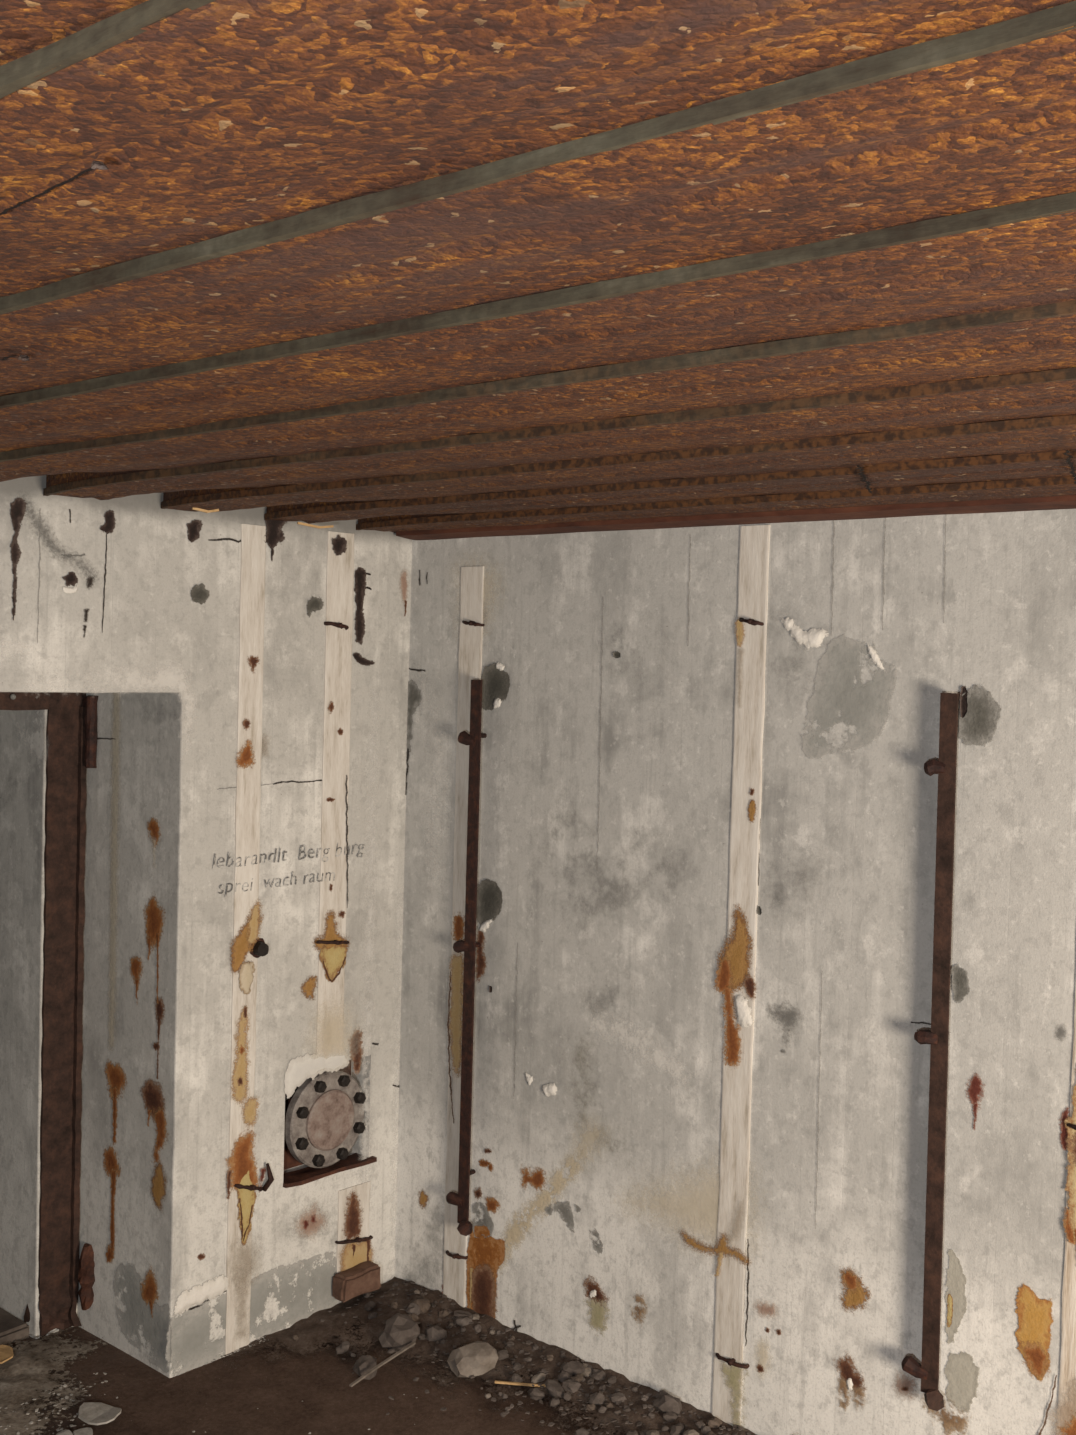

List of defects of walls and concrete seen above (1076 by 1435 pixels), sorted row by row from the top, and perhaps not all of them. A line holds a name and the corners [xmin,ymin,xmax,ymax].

crack [0,161,108,215]
rust [446,680,505,1319]
rust [715,905,756,1067]
rust [103,896,167,1262]
rust [226,901,267,1245]
rust [1059,1107,1070,1151]
rust [418,1191,428,1209]
rust [840,1269,870,1314]
rust [1015,1284,1053,1382]